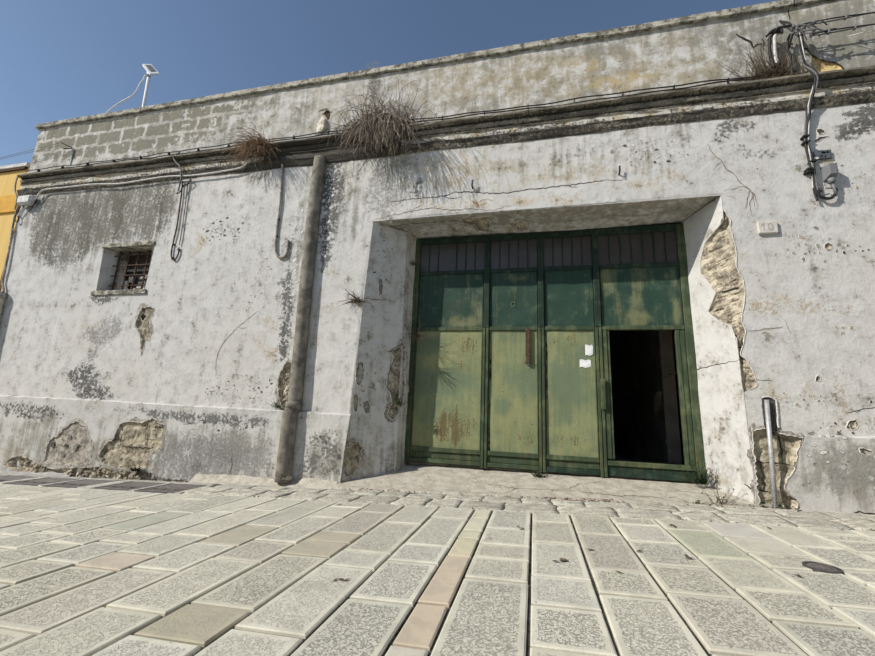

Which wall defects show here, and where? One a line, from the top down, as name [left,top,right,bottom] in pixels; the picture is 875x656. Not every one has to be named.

water stain [29,179,180,266]
water stain [320,162,345,273]
crack [378,179,627,230]
water stain [67,319,121,400]
spalling [130,303,155,356]
spalling [205,359,292,410]
spalling [353,339,409,422]
spalling [700,212,758,391]
spalling [4,408,189,482]
spalling [314,429,366,477]
spalling [744,418,875,511]